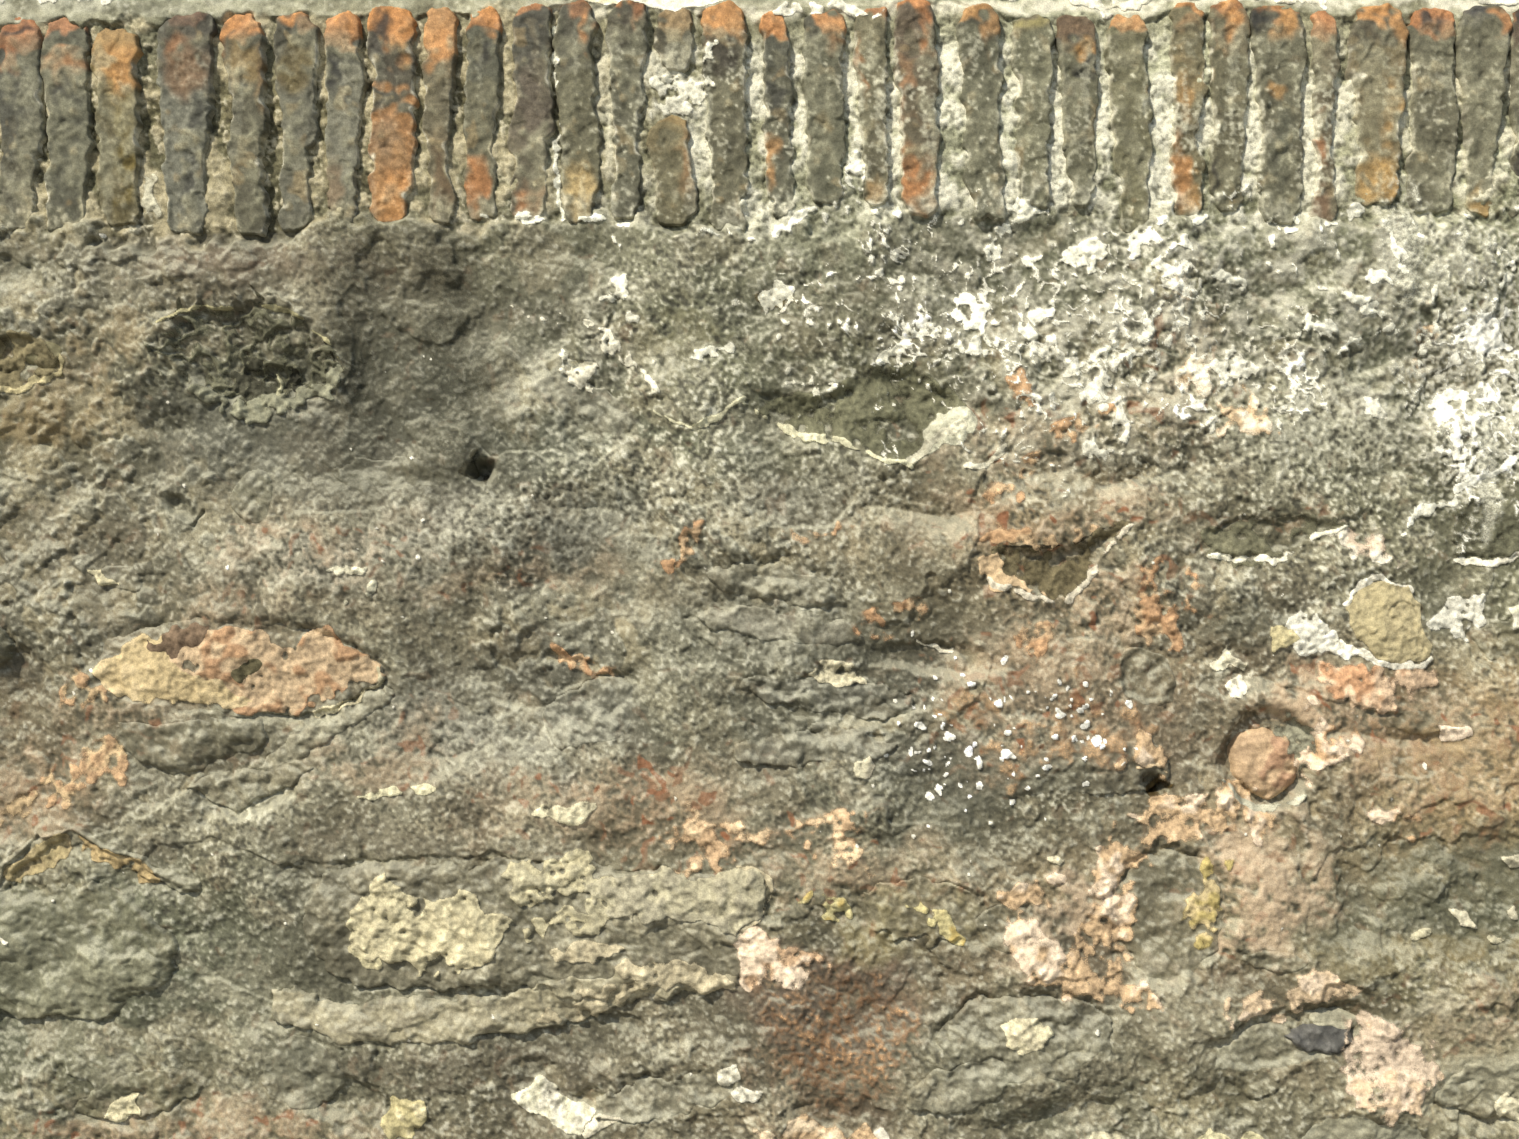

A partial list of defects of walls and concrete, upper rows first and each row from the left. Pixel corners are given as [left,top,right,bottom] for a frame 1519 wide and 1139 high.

flaking render [571,0,723,12]
flaking render [772,0,881,18]
flaking render [1069,0,1150,19]